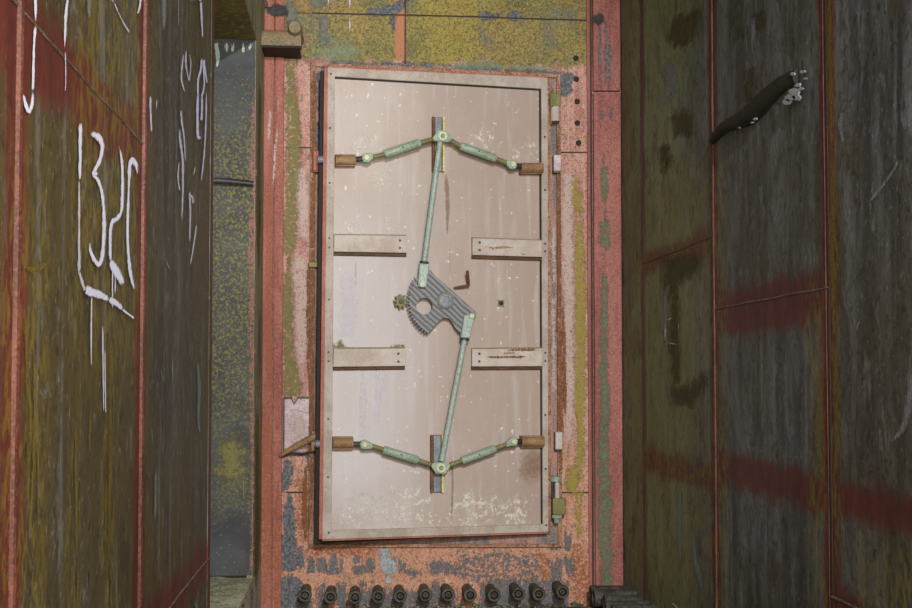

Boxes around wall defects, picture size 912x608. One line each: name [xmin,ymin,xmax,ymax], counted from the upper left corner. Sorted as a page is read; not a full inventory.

corrosion [556,173,567,432]
peeling [281,454,589,608]